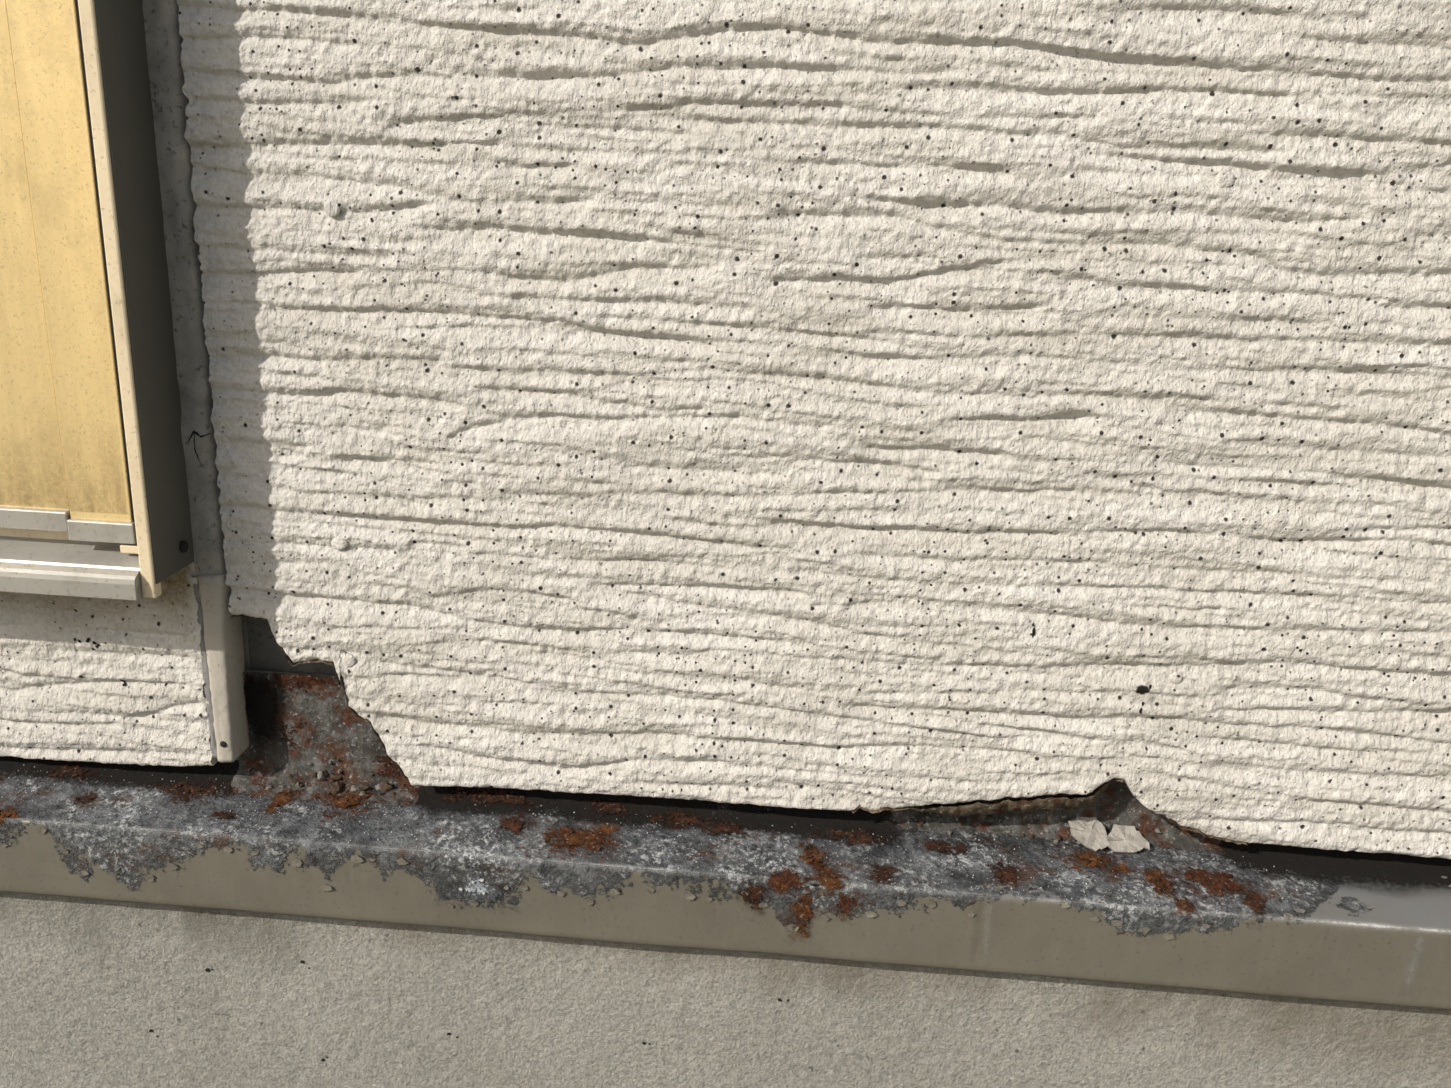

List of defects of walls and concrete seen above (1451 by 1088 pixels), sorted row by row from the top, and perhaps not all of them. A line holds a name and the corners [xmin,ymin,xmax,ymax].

rust [0,805,21,824]
rust [32,764,110,805]
rust [146,779,242,821]
rust [265,752,400,822]
rust [438,857,513,909]
rust [443,786,627,872]
peeling [0,614,1373,941]
rust [737,828,888,938]
rust [866,863,900,888]
rust [922,838,969,856]
rust [986,859,1021,887]
rust [1049,843,1267,916]